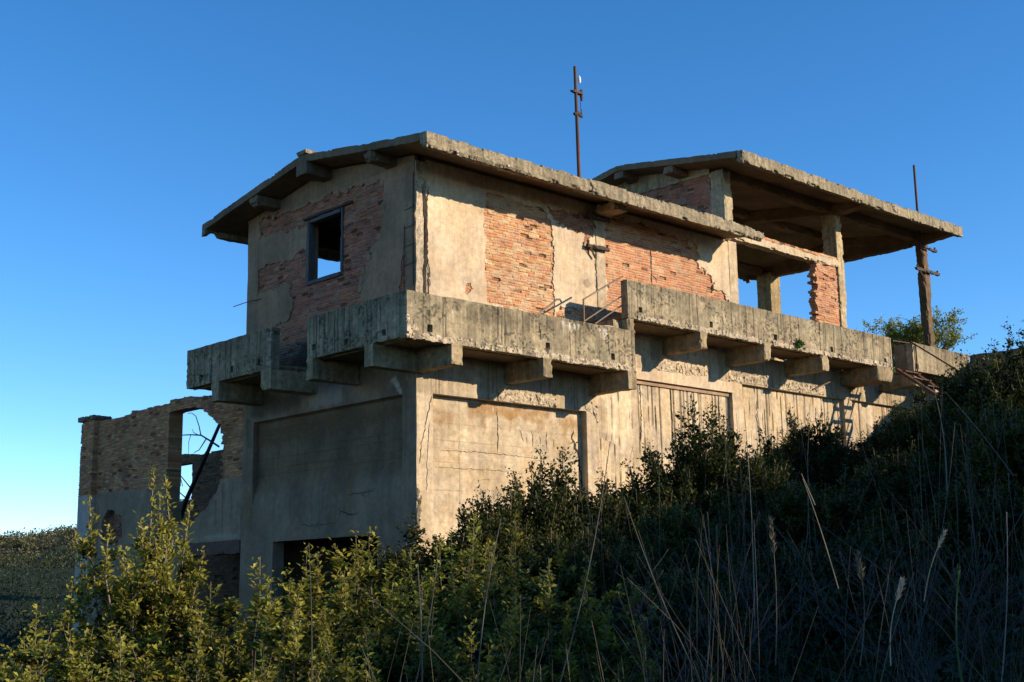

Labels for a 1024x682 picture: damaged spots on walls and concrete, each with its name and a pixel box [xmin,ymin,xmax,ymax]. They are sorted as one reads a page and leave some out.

peeling [233,179,386,369]
peeling [483,193,729,323]
crack [420,397,583,488]
spalling [489,390,558,407]
spalling [655,361,708,376]
spalling [634,316,893,369]